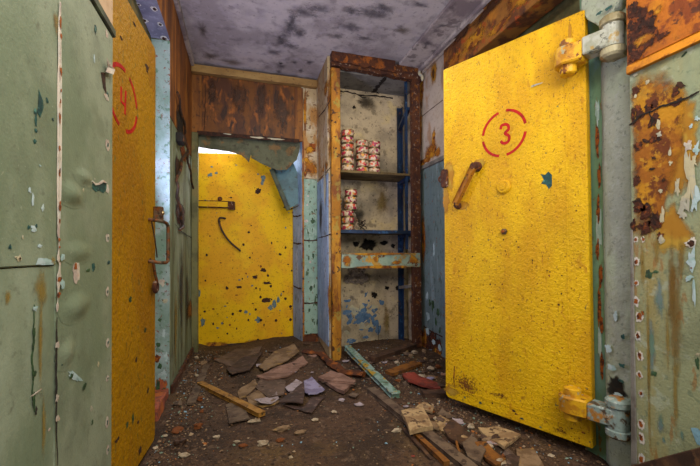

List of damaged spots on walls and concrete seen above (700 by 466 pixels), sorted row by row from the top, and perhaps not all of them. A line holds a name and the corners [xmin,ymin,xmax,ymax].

corrosion [420,64,440,166]
crack [629,91,699,127]
peeling [83,178,109,194]
corrosion [626,0,700,356]
peeling [675,140,700,219]
corrosion [343,218,426,269]
peeling [343,268,384,344]
corrosion [634,296,650,463]